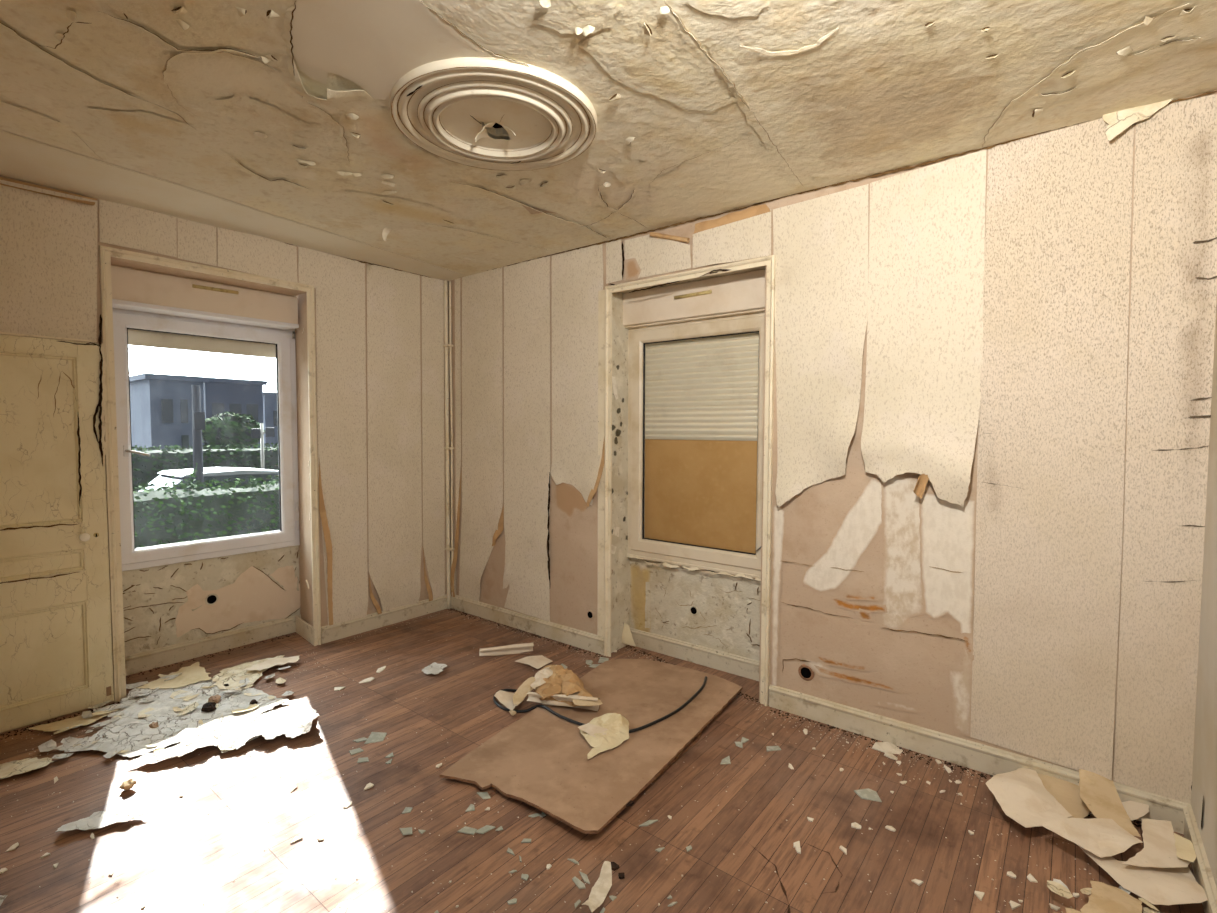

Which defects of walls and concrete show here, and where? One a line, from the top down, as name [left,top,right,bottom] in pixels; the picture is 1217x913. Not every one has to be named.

crack [0,0,302,128]
crack [232,158,308,189]
peeling [266,0,505,138]
crack [419,0,529,67]
spalling [470,114,516,142]
crack [451,0,838,293]
crack [981,3,1200,149]
crack [0,314,107,531]
peeling [123,549,309,645]
peeling [627,555,761,651]